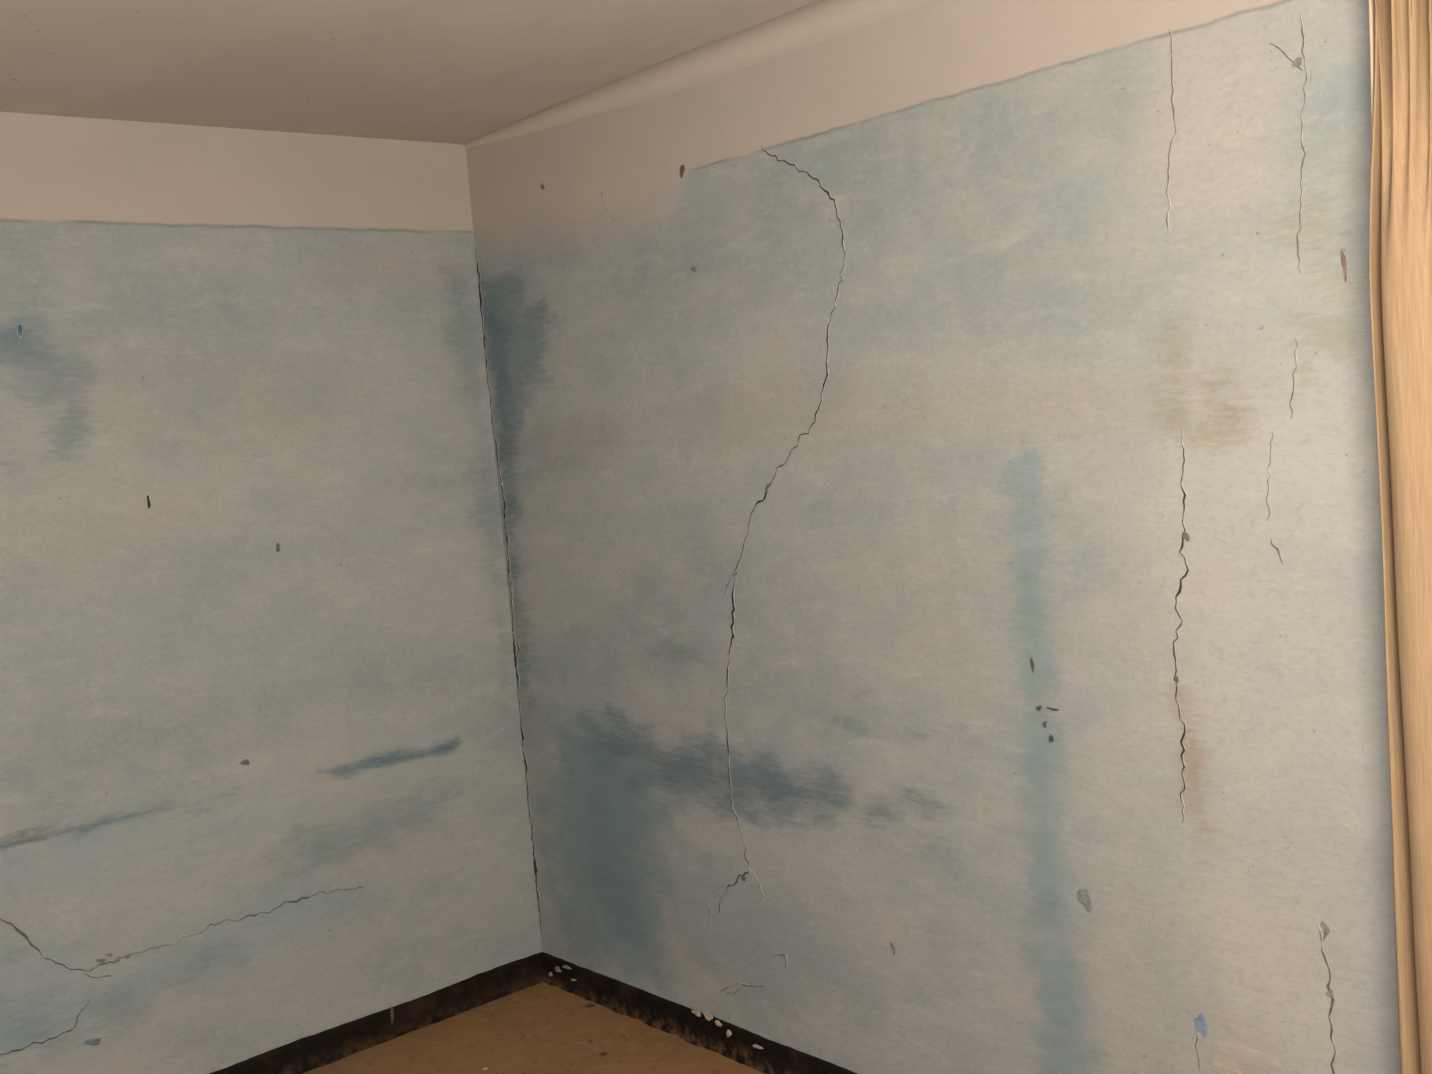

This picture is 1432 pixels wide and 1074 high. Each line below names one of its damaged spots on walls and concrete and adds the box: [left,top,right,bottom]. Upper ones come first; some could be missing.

crack [1166,29,1177,234]
crack [1270,12,1313,274]
crack [707,145,847,942]
crack [1173,426,1190,822]
crack [1266,338,1298,565]
crack [0,886,364,1055]
crack [1194,1033,1202,1074]
crack [1317,917,1337,1074]